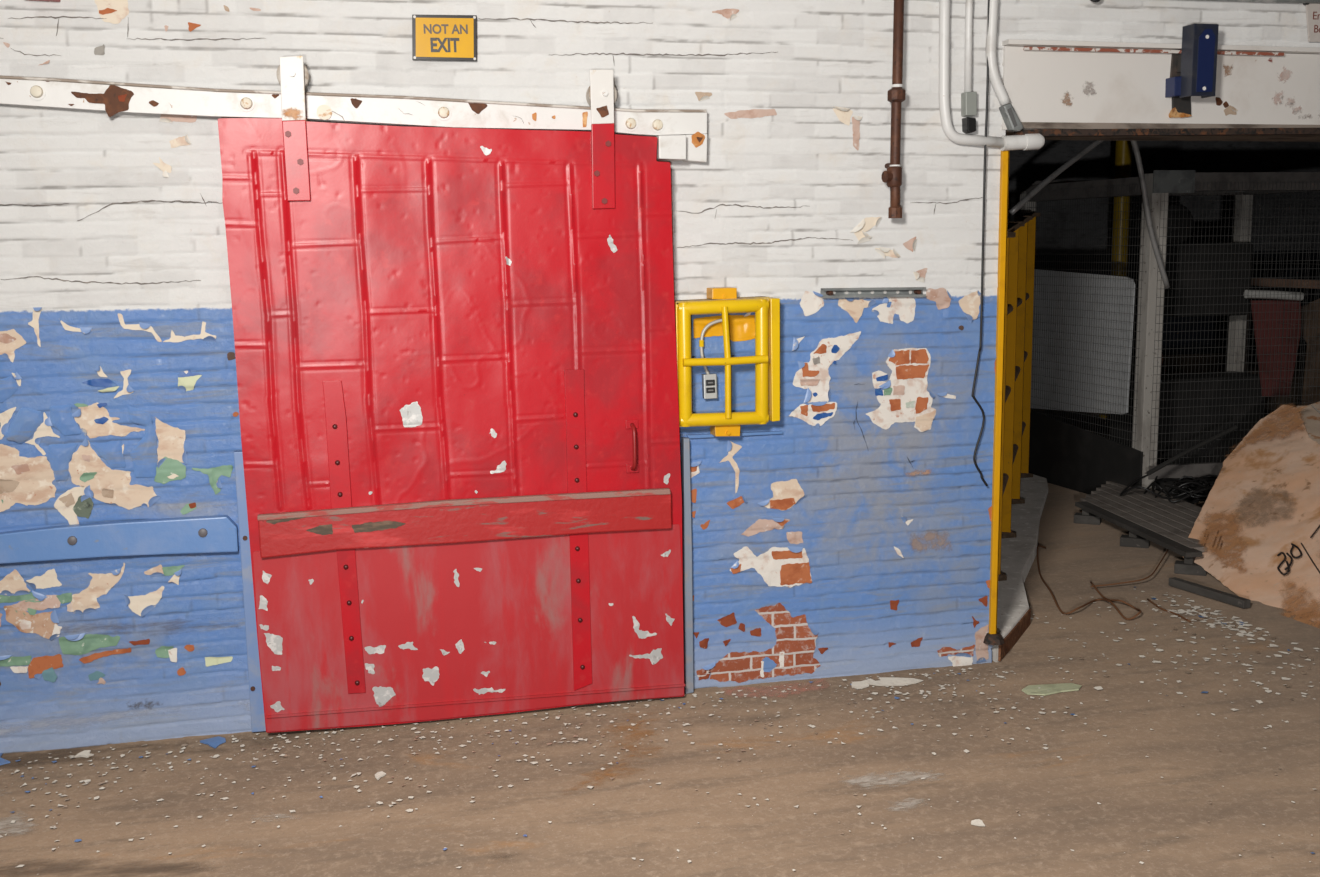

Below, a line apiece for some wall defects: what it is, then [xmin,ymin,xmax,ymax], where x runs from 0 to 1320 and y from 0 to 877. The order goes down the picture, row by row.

peeling [0,307,42,386]
peeling [60,321,92,334]
peeling [118,313,216,342]
spalling [263,517,333,535]
spalling [352,521,406,533]
peeling [490,461,506,474]
flaking render [690,460,710,530]
peeling [719,440,812,588]
peeling [1031,591,1319,730]
flaking render [0,563,1107,850]